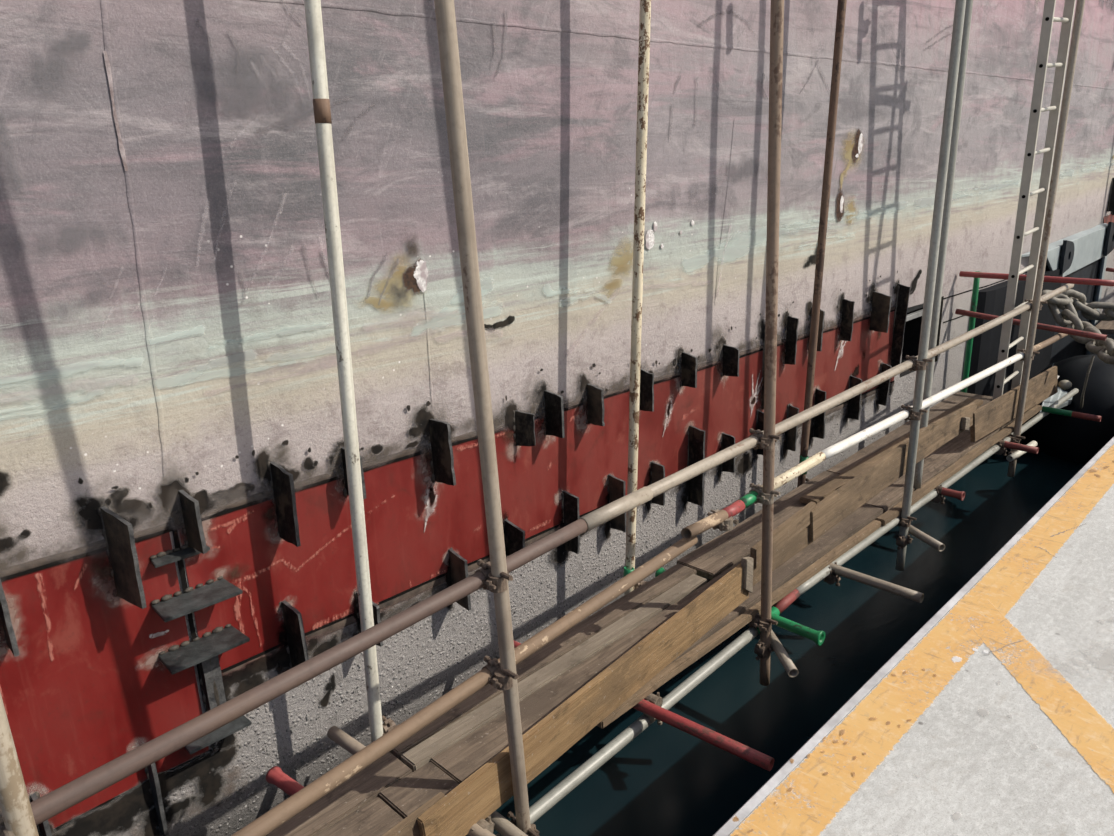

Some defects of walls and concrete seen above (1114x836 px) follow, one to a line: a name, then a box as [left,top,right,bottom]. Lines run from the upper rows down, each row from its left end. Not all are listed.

corrosion [836,129,863,224]
corrosion [365,241,429,311]